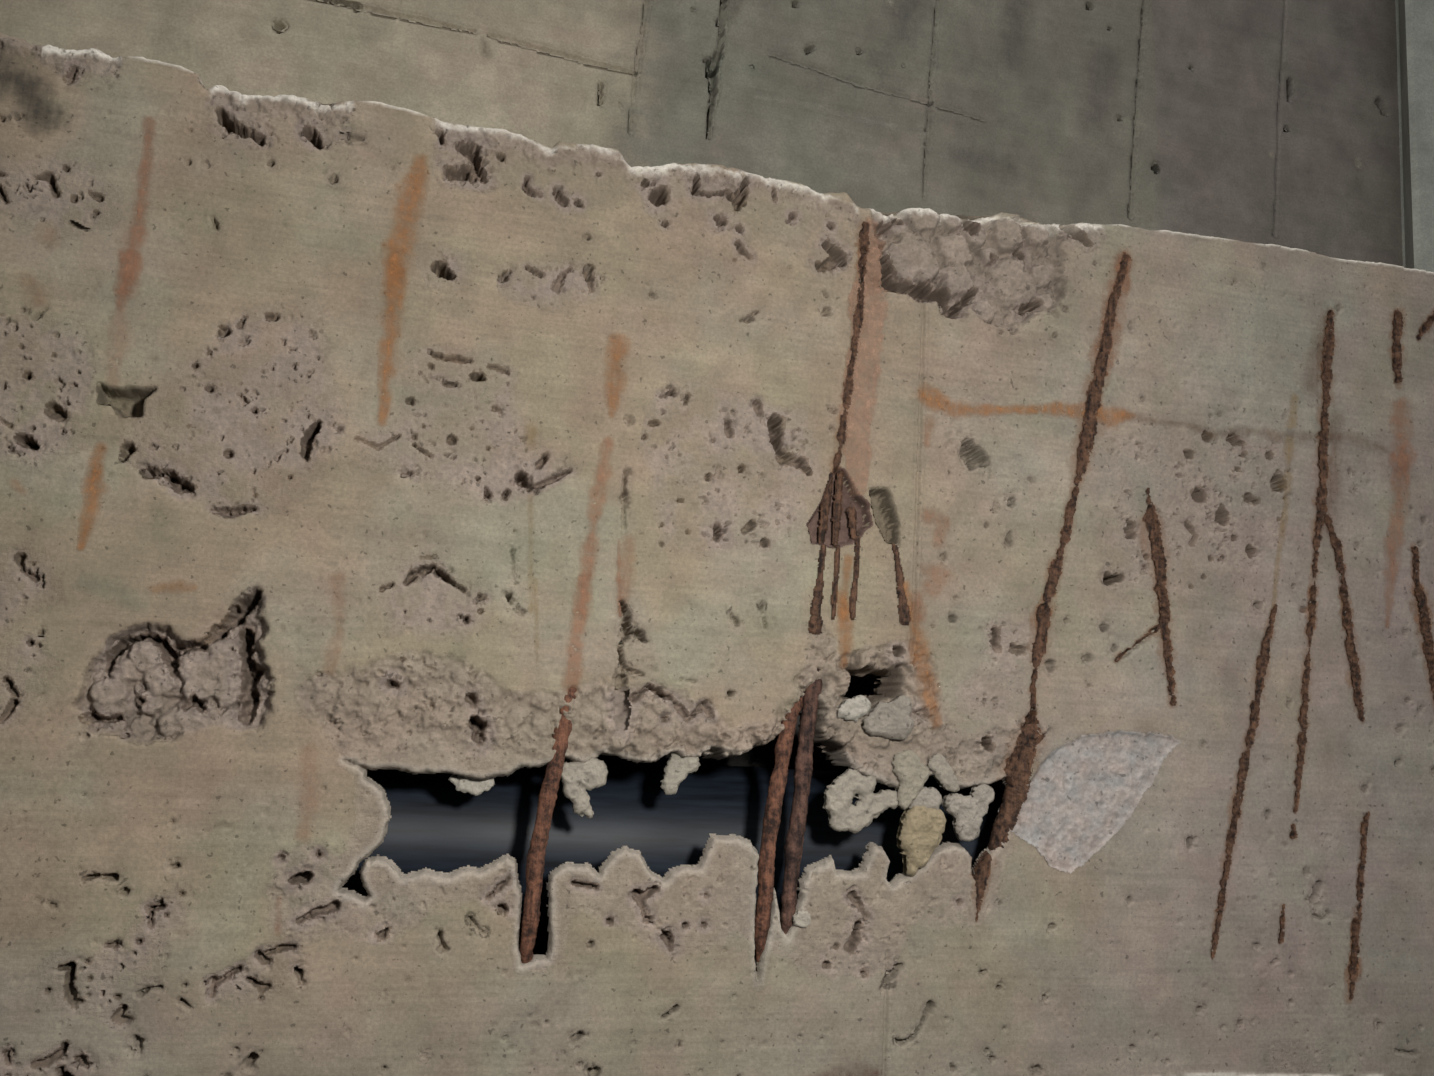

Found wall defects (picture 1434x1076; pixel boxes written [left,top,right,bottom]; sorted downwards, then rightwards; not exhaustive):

spalling [198,77,358,160]
spalling [1051,222,1111,253]
spalling [78,694,148,739]
spalling [105,588,266,727]
corrosion [520,687,577,964]
spalling [205,613,1181,1002]
corrosion [754,655,823,962]
corrosion [808,221,870,663]
corrosion [921,252,1132,922]
corrosion [1211,604,1278,959]
corrosion [1290,310,1365,839]
corrosion [1348,811,1370,1000]